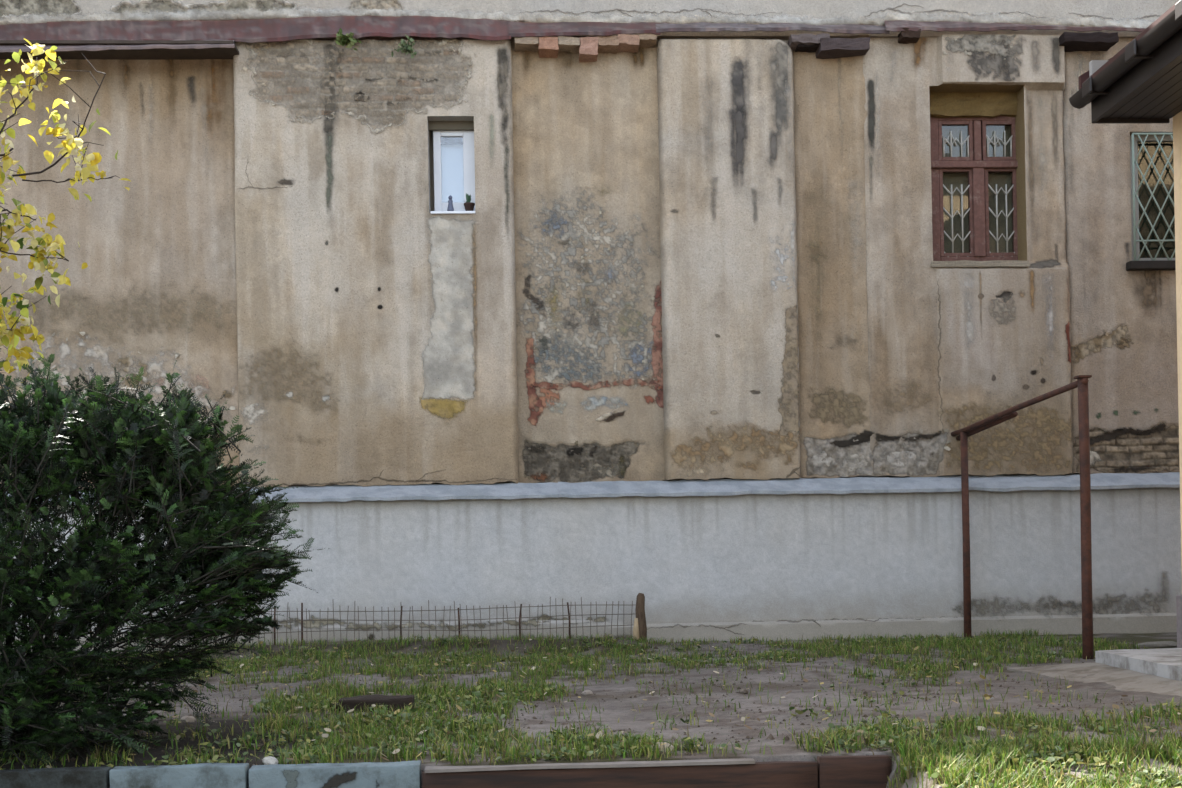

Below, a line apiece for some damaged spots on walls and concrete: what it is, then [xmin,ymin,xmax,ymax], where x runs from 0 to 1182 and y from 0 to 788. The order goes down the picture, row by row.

flaking render [0,0,82,18]
flaking render [108,0,298,14]
flaking render [243,39,474,133]
damp [730,60,747,175]
damp [769,42,788,164]
flaking render [943,34,1015,60]
peeling [520,194,664,426]
flaking render [8,332,264,424]
flaking render [778,306,952,477]
flaking render [522,440,639,482]
flaking render [1073,423,1180,473]
damp [954,573,1166,615]